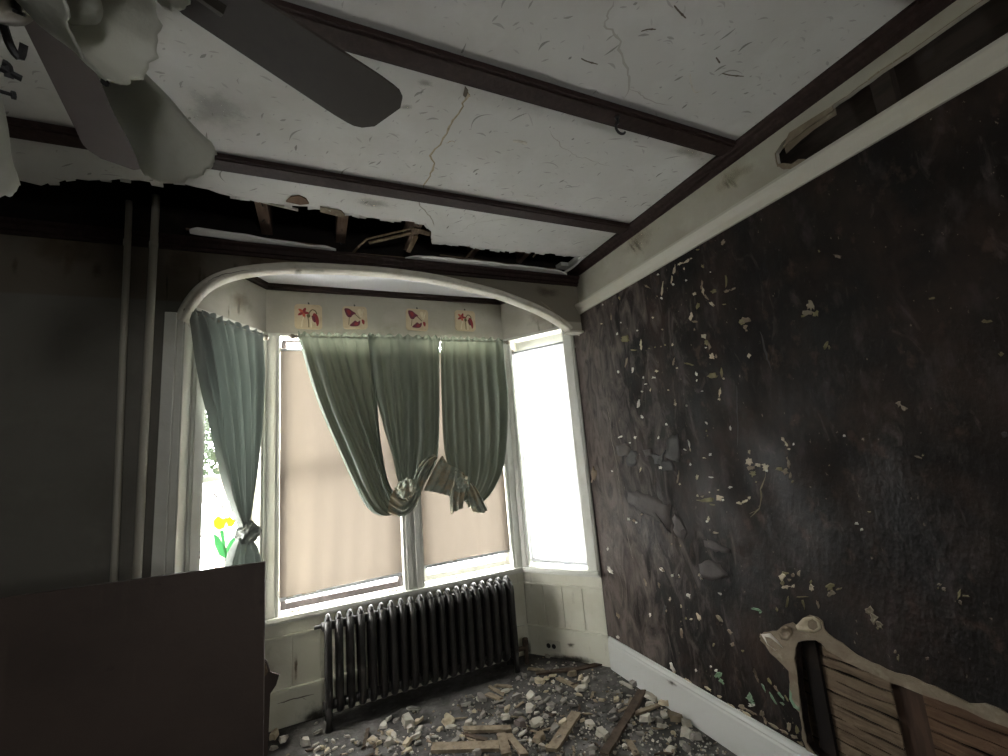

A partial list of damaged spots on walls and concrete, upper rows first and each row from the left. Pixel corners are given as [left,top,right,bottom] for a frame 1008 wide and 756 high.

crack [603,1,666,105]
crack [418,96,471,224]
peeling [696,486,732,534]